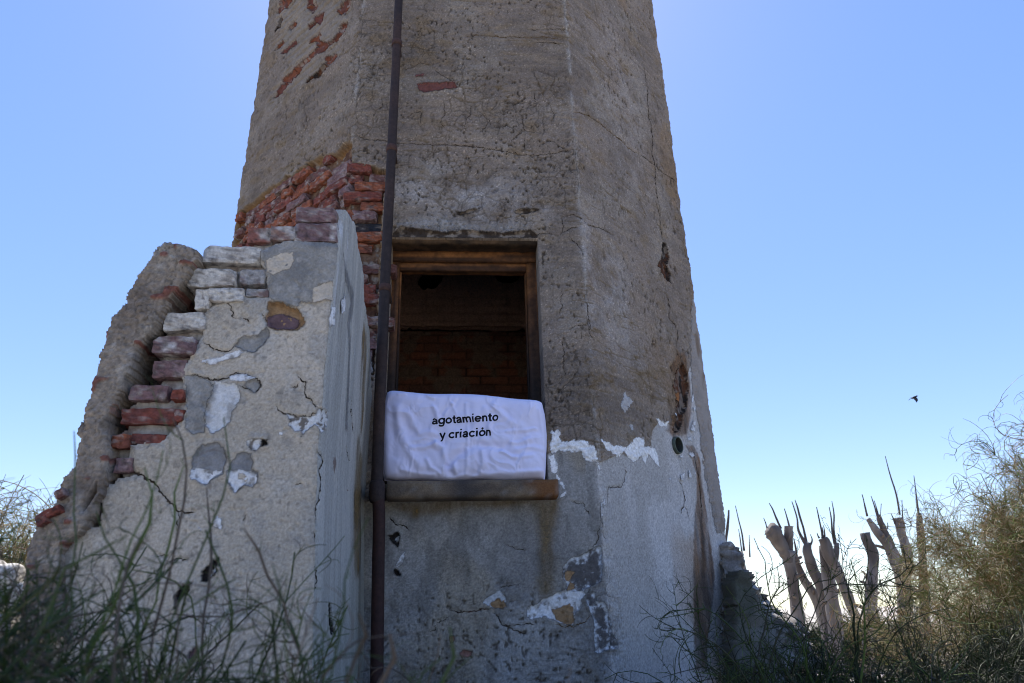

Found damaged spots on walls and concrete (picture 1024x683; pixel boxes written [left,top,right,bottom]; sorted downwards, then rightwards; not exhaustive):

spalling [274,0,351,98]
crack [359,71,676,240]
flaking render [233,155,538,374]
spalling [658,242,672,284]
flaking render [190,374,267,493]
crack [277,376,318,417]
flaking render [279,408,328,437]
spalling [672,363,696,458]
crack [134,473,193,526]
flaking render [527,547,618,654]